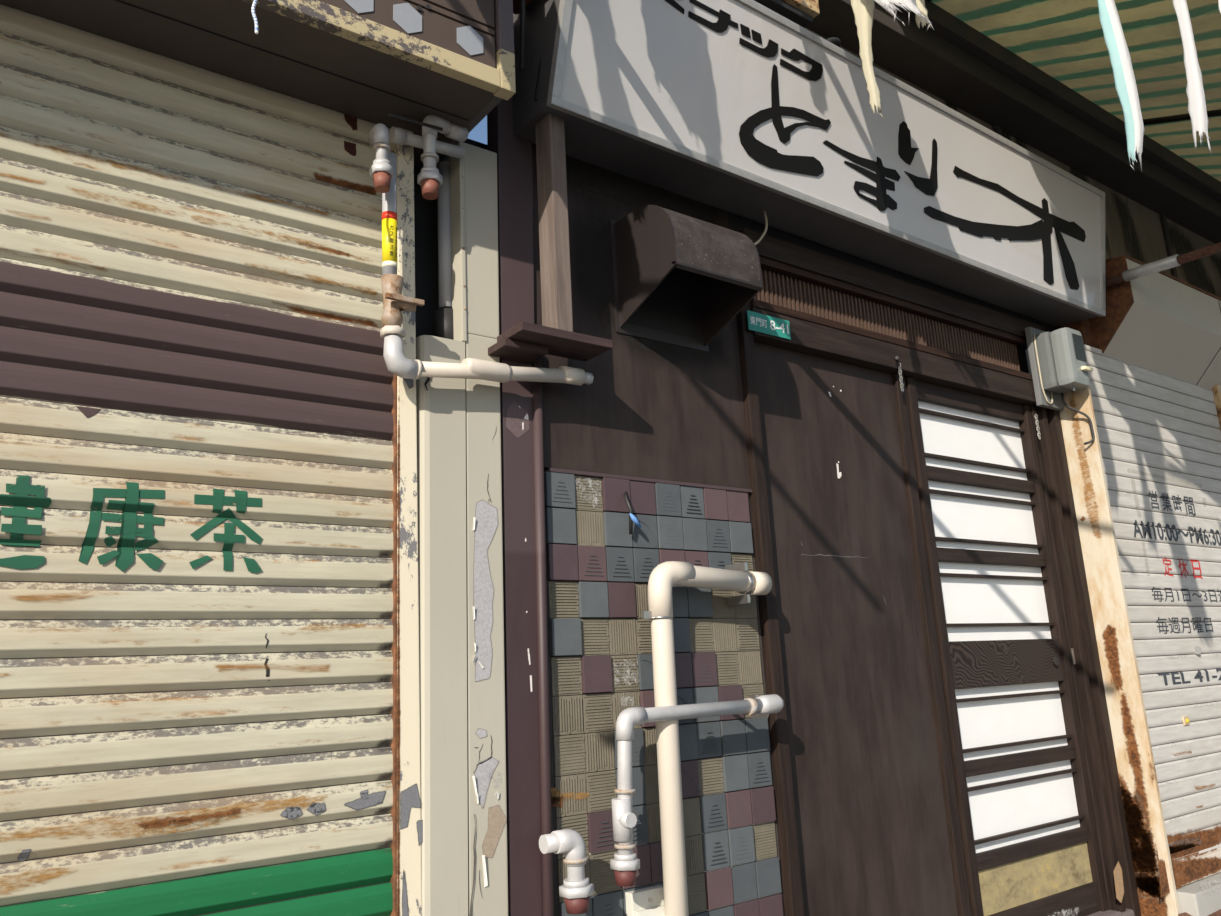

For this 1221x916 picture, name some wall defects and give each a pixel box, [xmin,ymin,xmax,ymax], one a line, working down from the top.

corrosion [35,144,185,180]
corrosion [314,172,376,195]
corrosion [265,232,352,256]
corrosion [273,270,377,295]
corrosion [273,302,377,327]
peeling [472,499,498,682]
corrosion [1103,625,1221,916]
corrosion [0,796,324,841]
flaking render [472,757,507,899]
corrosion [0,869,68,893]